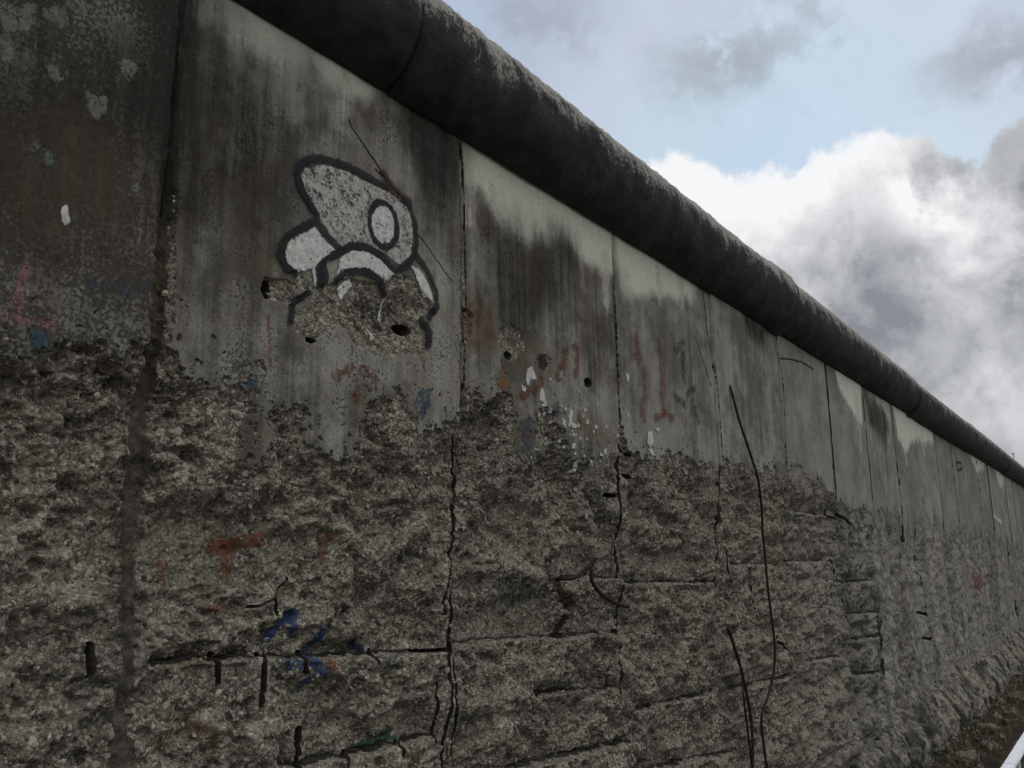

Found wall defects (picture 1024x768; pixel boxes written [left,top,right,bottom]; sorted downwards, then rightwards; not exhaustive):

crack [459,143,467,397]
damp [405,108,697,326]
crack [406,432,459,768]
spalling [0,189,1024,768]
crack [611,277,632,628]